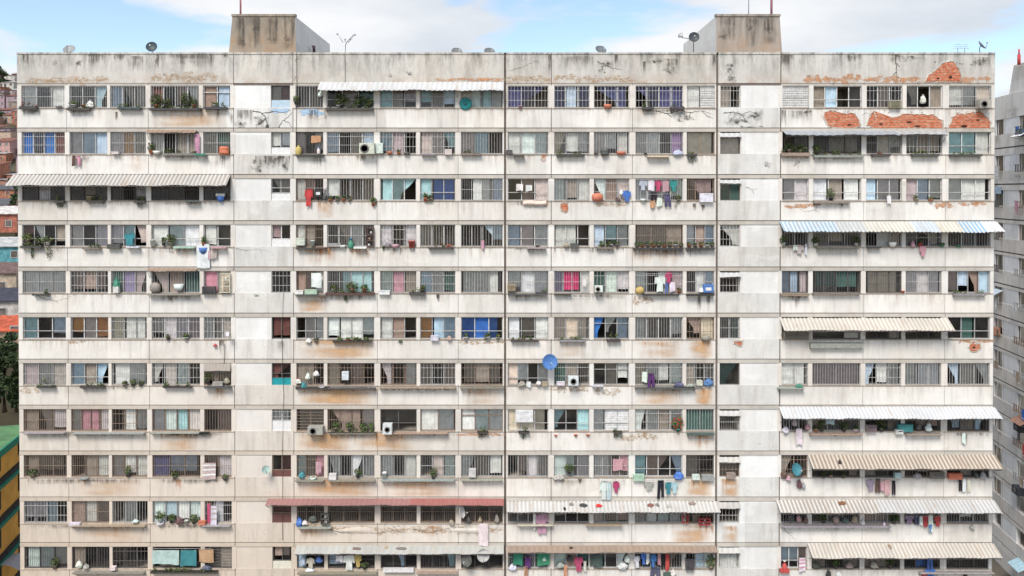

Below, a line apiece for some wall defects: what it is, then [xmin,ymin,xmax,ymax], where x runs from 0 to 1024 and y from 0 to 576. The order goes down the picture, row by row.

spalling [805,60,991,84]
crack [253,111,292,128]
crack [657,110,754,123]
spalling [822,109,992,130]
spalling [959,340,994,353]